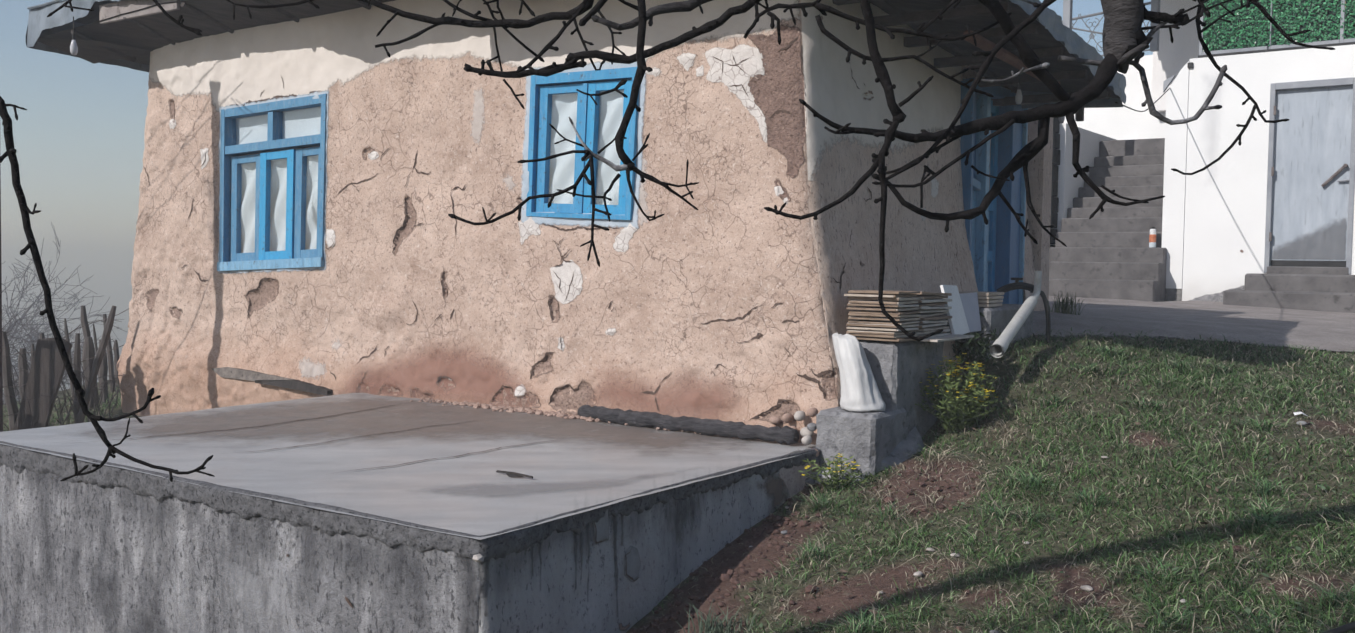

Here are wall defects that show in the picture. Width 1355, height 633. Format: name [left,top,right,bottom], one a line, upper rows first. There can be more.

spalling [677,24,807,204]
spalling [392,194,422,255]
peeling [503,176,541,245]
spalling [245,277,279,318]
peeling [489,242,596,414]
water stain [125,352,751,448]
crack [642,373,671,411]